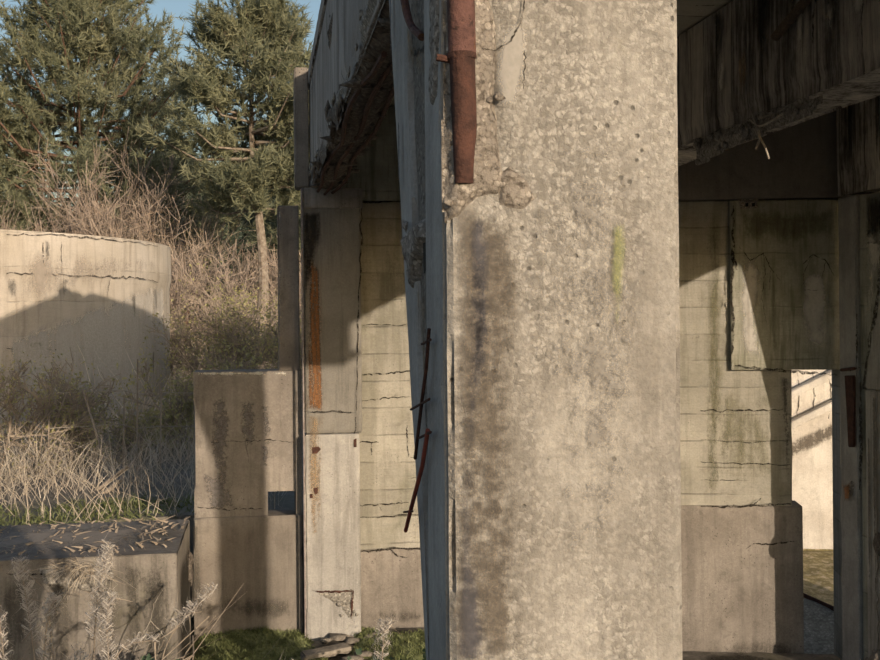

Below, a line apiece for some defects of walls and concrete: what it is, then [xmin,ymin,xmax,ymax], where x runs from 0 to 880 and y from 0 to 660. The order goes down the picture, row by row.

spalling [308,0,394,195]
spalling [428,0,535,223]
rust [309,264,322,513]
spalling [318,589,359,618]
crack [306,201,410,455]
crack [360,502,416,518]
leakage [461,216,515,660]
crack [703,440,785,481]
crack [701,498,791,508]
crack [701,205,860,419]